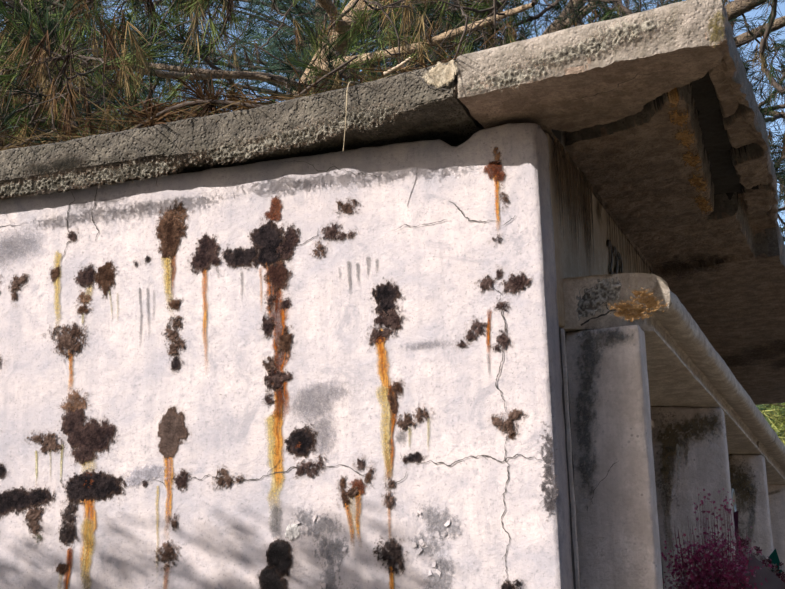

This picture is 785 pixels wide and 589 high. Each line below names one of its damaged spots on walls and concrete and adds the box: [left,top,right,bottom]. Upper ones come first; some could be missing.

rust [0,251,128,589]
rust [133,199,189,372]
rust [190,196,325,589]
crack [232,459,374,488]
rust [367,278,429,517]
crack [397,202,515,229]
crack [393,435,542,578]
crack [495,289,507,411]
damp [540,430,558,516]
damp [575,328,633,495]
damp [553,135,721,278]
damp [654,411,721,537]